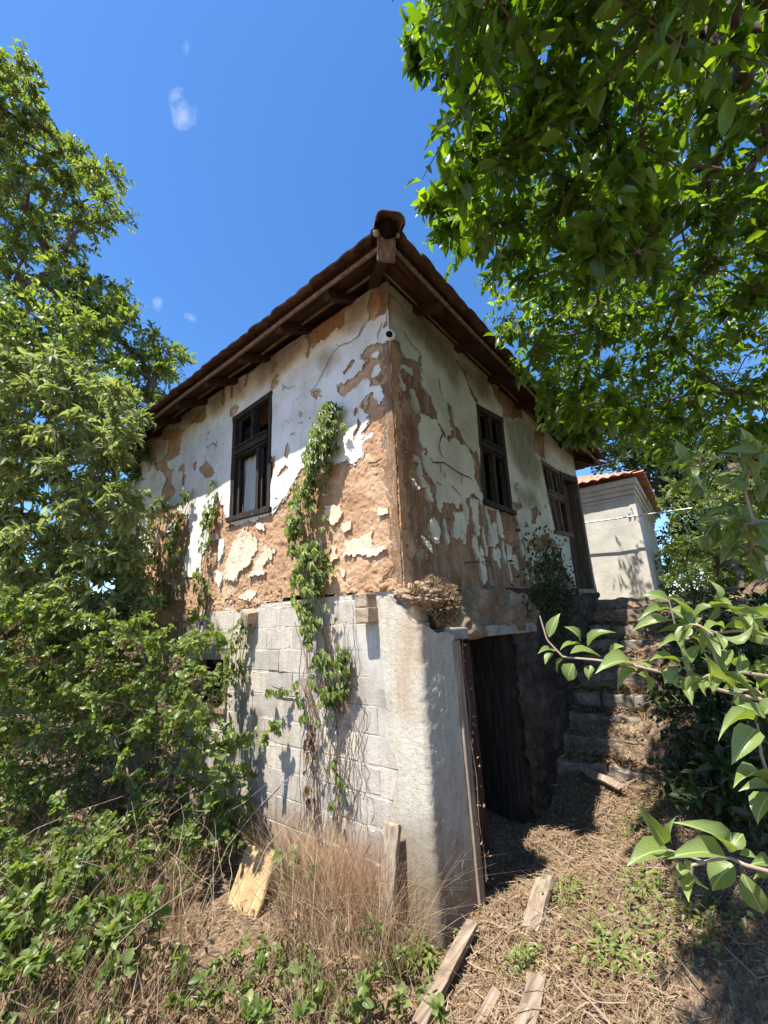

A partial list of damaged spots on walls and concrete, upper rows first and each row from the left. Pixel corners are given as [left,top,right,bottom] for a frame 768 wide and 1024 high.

flaking render [144,341,575,628]
crack [431,434,472,495]